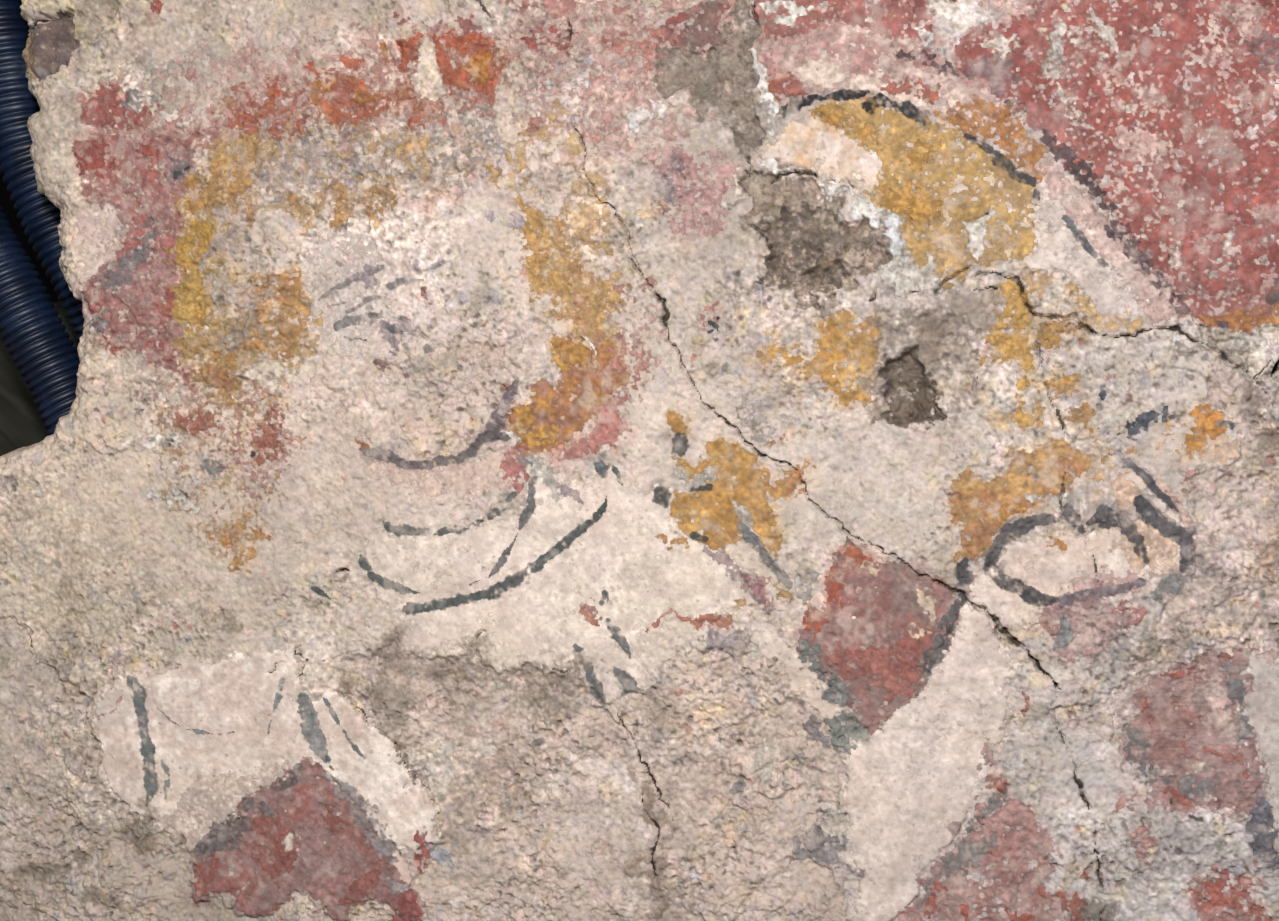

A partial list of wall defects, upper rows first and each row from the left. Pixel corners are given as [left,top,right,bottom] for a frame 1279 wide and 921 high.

spalling [651,0,776,154]
crack [747,156,822,184]
spalling [728,158,896,317]
crack [599,200,1057,687]
spalling [872,345,947,430]
crack [912,267,1231,430]
crack [617,713,669,876]
crack [1057,728,1104,921]